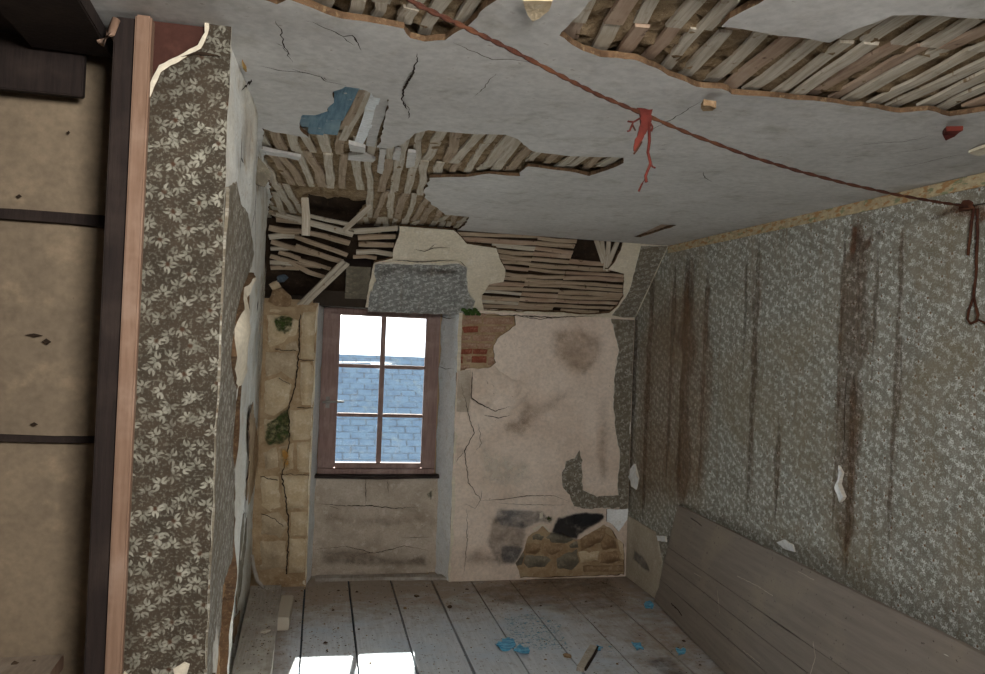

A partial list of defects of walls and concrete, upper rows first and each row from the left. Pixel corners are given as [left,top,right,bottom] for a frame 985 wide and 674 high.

spalling [313,0,485,35]
peeling [523,0,553,21]
spalling [563,0,985,111]
crack [401,56,418,117]
peeling [942,126,963,140]
spalling [220,87,628,643]
crack [243,315,314,574]
crack [441,367,567,570]
leakage [495,511,604,539]